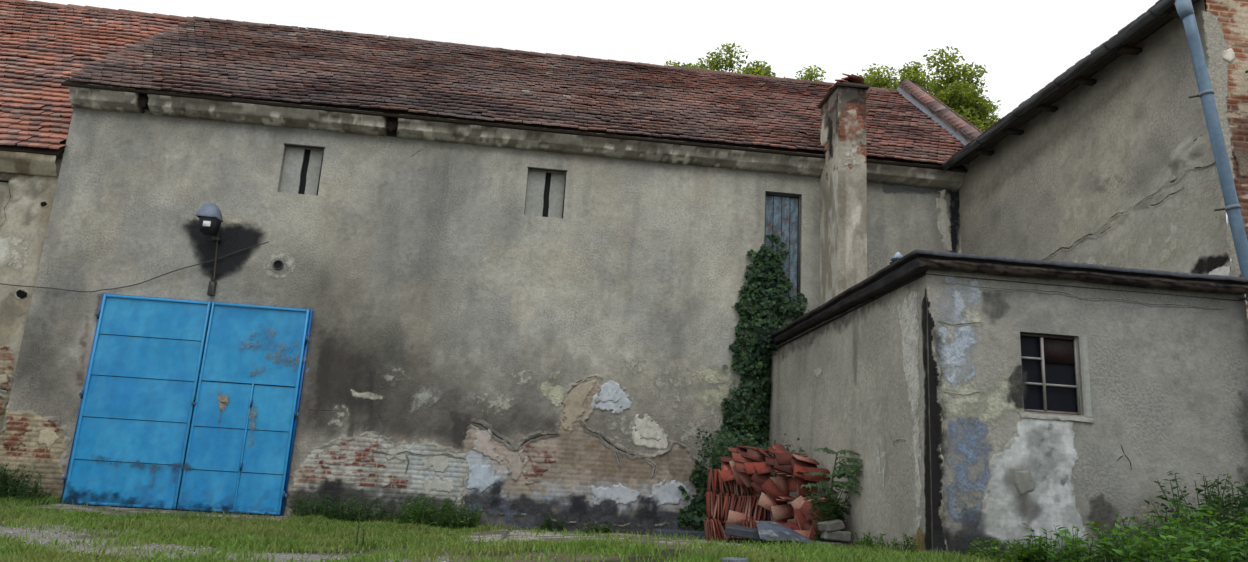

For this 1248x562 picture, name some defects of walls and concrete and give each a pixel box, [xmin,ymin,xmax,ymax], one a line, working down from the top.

peeling [1222,48,1235,65]
crack [942,134,1224,310]
peeling [1209,265,1230,276]
spalling [0,345,71,504]
rust [218,393,229,422]
damp [284,479,706,536]
spalling [286,368,733,529]
spalling [896,275,1088,554]